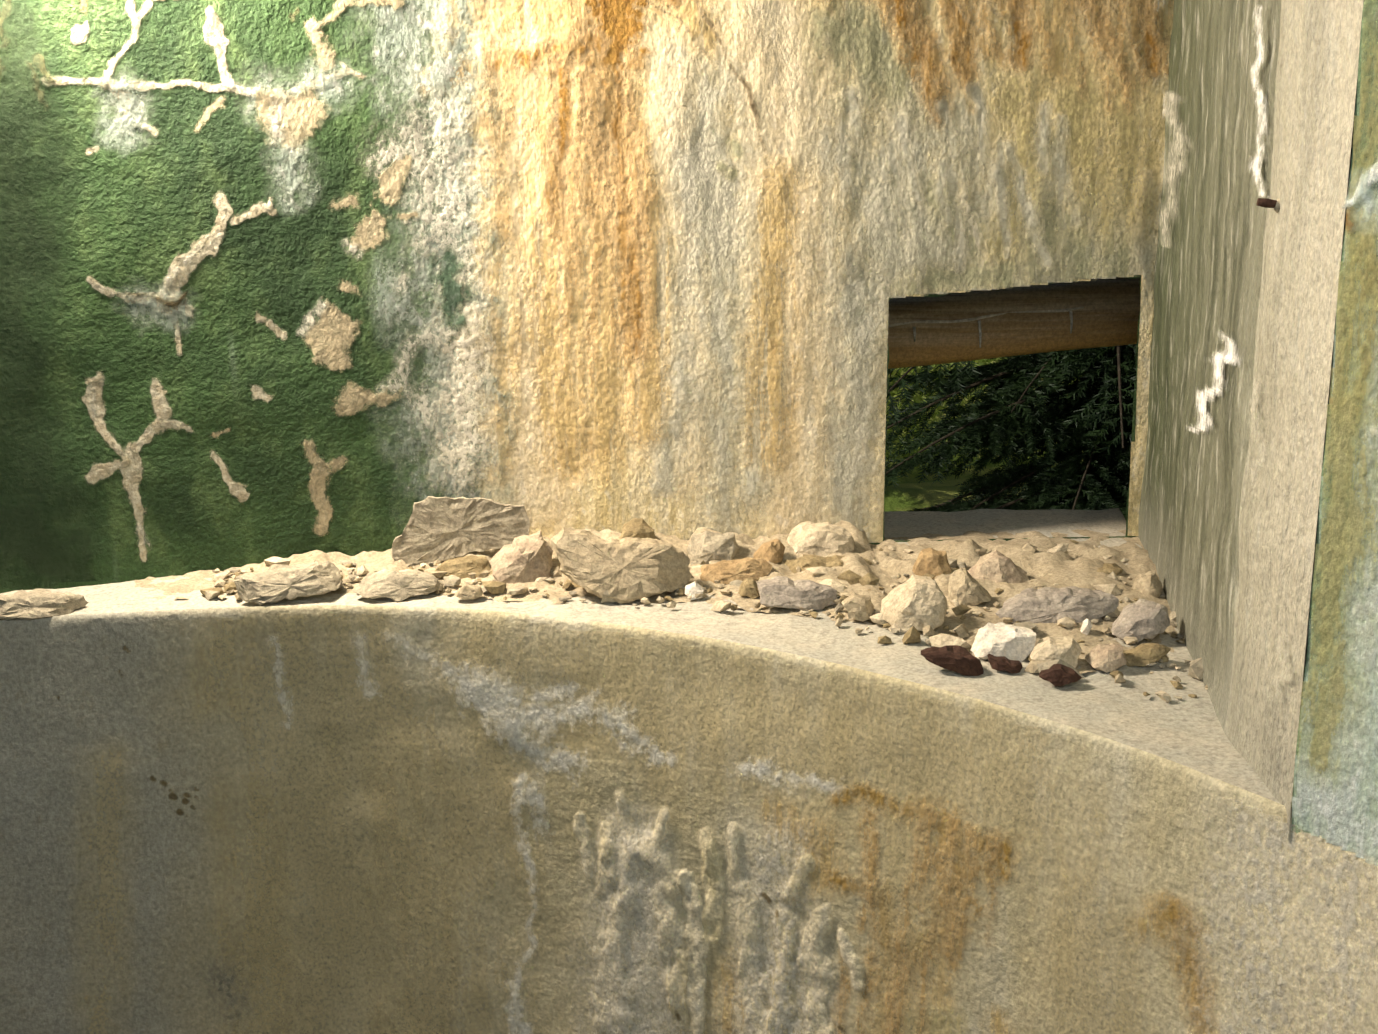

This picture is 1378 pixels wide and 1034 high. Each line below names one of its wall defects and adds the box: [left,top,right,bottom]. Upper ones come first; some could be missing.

peeling [82,372,193,562]
peeling [29,0,404,356]
peeling [255,280,402,416]
peeling [331,154,418,255]
water stain [366,0,509,500]
corrosion [450,0,716,478]
crack [676,0,764,148]
corrosion [878,0,1171,123]
water stain [1342,164,1378,219]
water stain [1203,243,1378,1034]
water stain [396,637,675,1034]
corrosion [764,784,1012,1034]